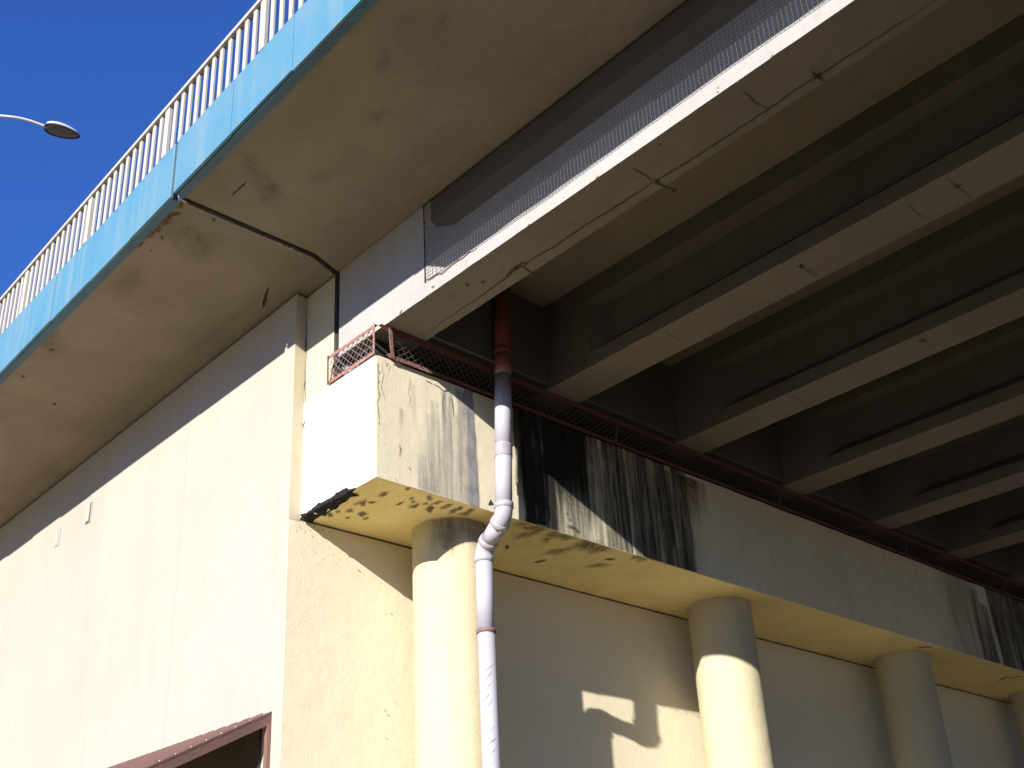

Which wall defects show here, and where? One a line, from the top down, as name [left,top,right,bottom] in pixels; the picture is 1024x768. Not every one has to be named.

crack [425,0,936,335]
spalling [296,488,387,552]
peeling [396,488,474,516]
damp [459,389,478,506]
damp [513,407,696,572]
damp [978,588,1024,670]